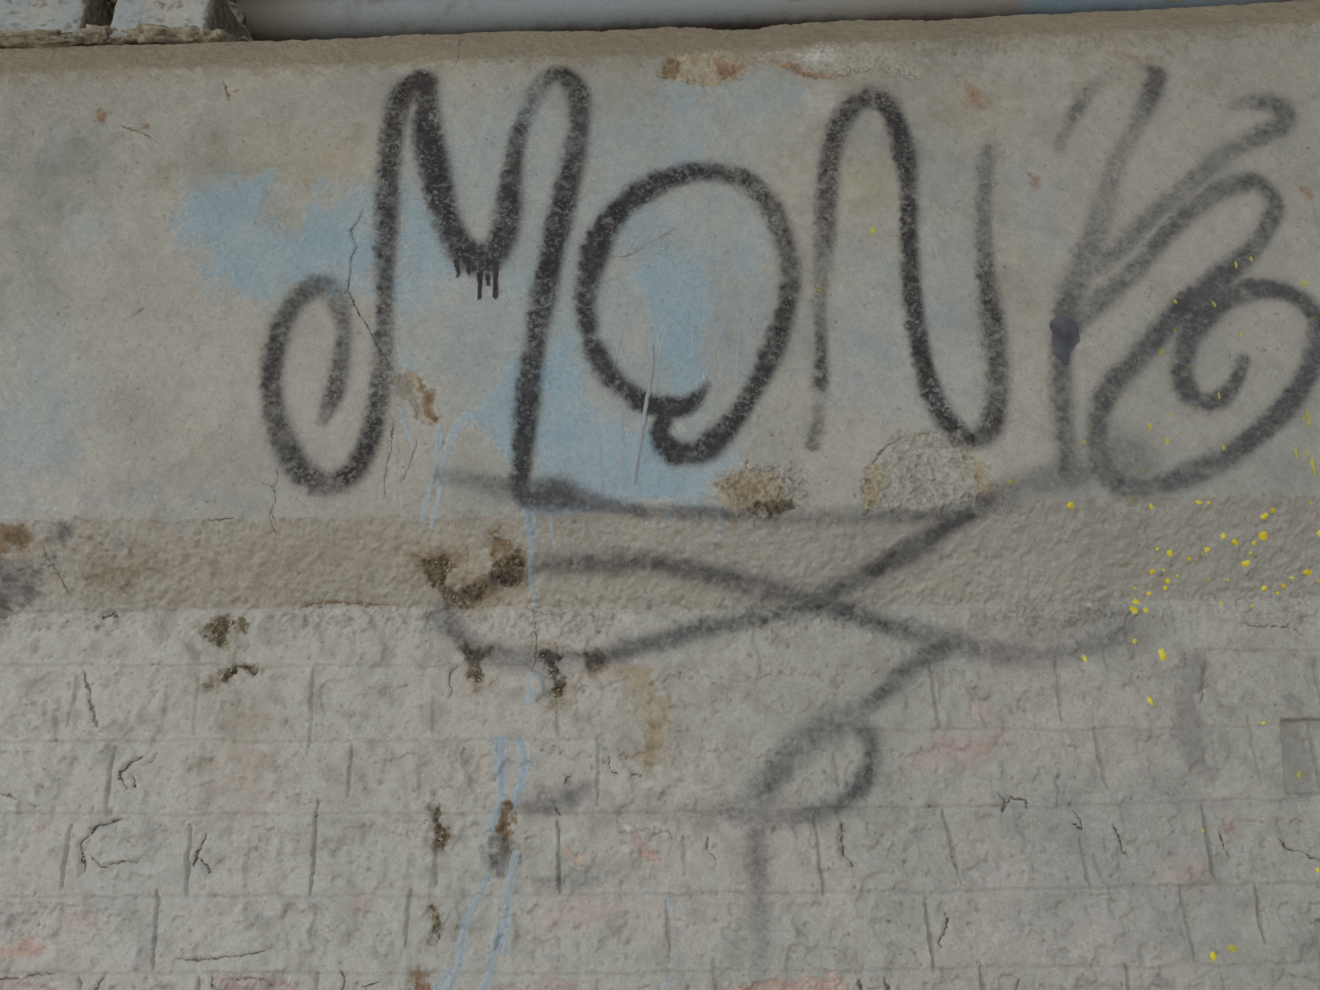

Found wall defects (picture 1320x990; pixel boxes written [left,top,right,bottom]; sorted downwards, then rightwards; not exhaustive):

flaking render [658,52,748,87]
crack [344,210,393,371]
flaking render [393,369,438,426]